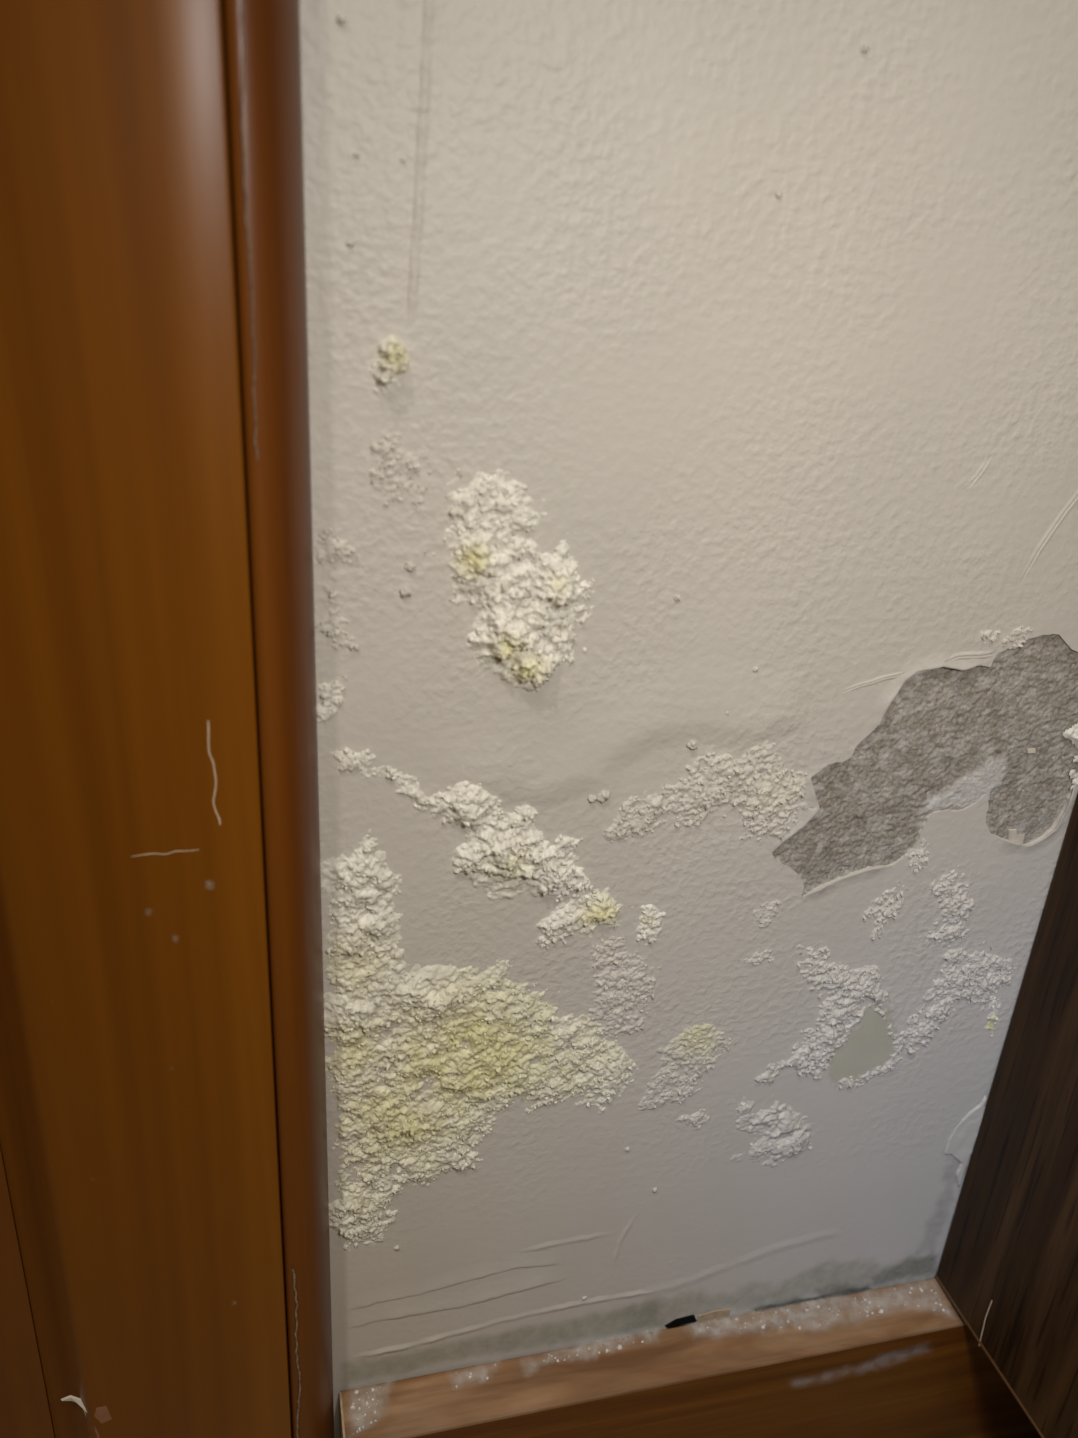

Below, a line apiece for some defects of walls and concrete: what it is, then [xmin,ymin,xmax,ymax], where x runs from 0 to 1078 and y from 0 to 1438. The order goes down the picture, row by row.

water stain [369,335,410,393]
water stain [424,468,597,692]
spalling [767,634,1078,904]
water stain [320,829,639,1253]
water stain [832,1013,895,1080]